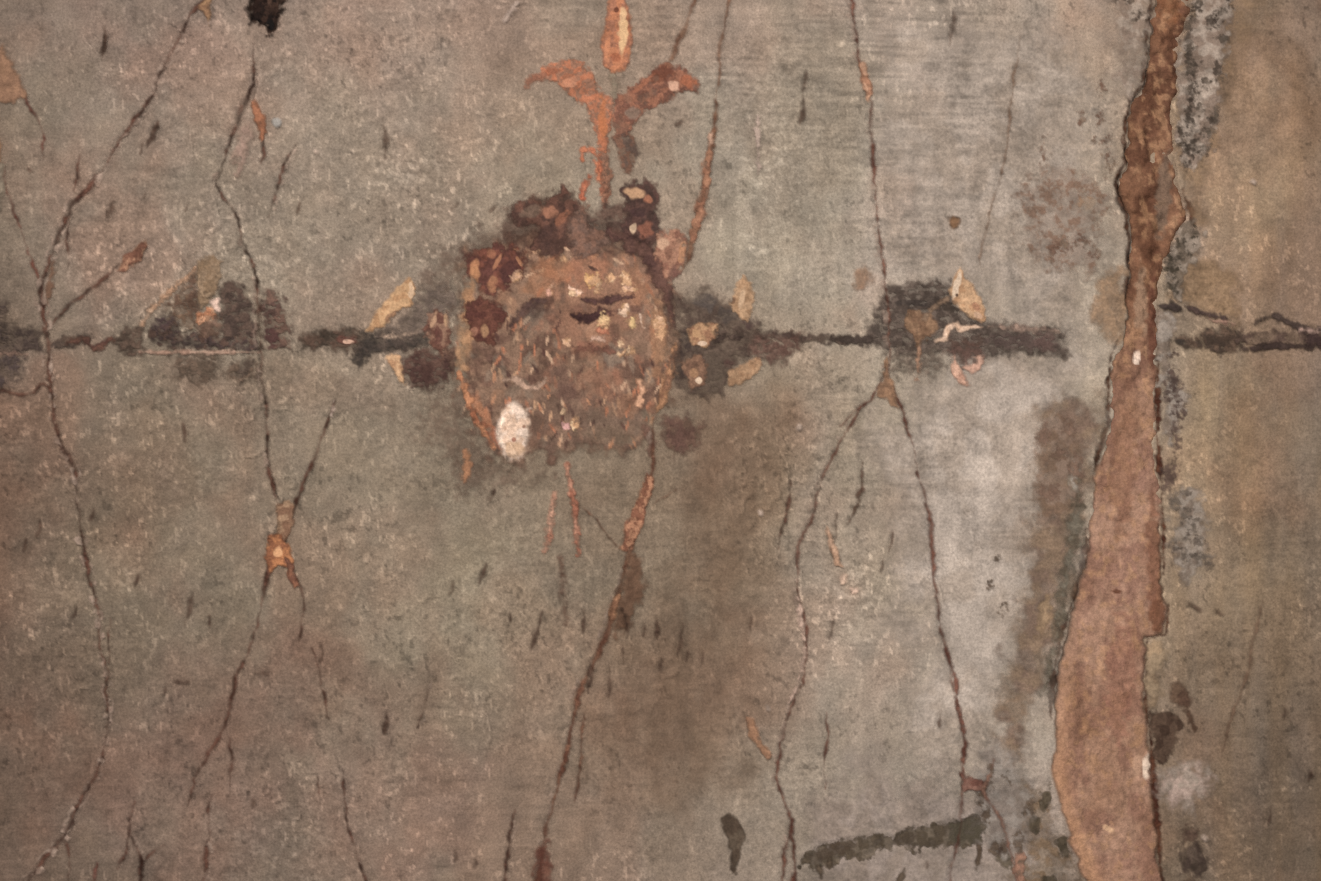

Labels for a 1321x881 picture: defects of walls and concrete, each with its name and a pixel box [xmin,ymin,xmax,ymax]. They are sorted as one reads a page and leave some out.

crack [0,0,211,484]
crack [216,64,285,292]
spalling [247,0,286,36]
crack [257,399,334,637]
flaking render [497,402,530,459]
crack [504,444,655,881]
crack [686,0,730,262]
crack [775,0,911,881]
water stain [798,784,1033,881]
crack [916,472,1018,881]
water stain [885,343,1081,774]
crack [1048,0,1196,881]